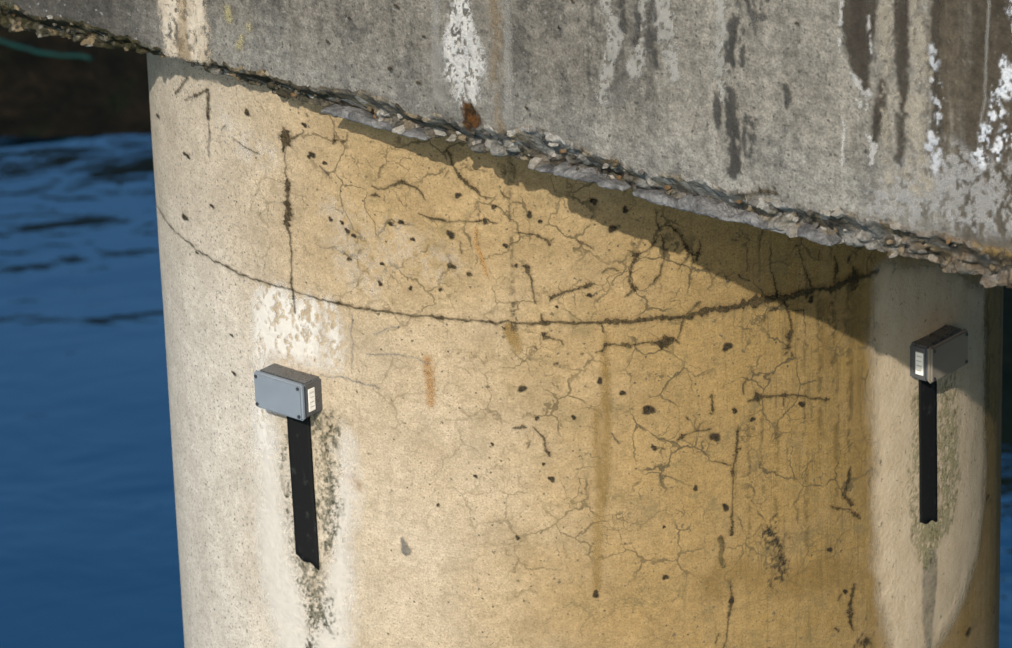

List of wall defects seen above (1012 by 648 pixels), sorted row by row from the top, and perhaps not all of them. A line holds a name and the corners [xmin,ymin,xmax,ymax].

leakage [158,0,211,64]
leakage [433,0,484,104]
crack [175,77,258,154]
corrosion [460,100,481,130]
spalling [0,2,1012,288]
leakage [838,0,1012,235]
crack [156,127,896,365]
crack [513,425,550,457]
crack [656,381,830,536]
crack [831,467,860,519]
leakage [764,527,784,586]
crack [834,583,870,648]